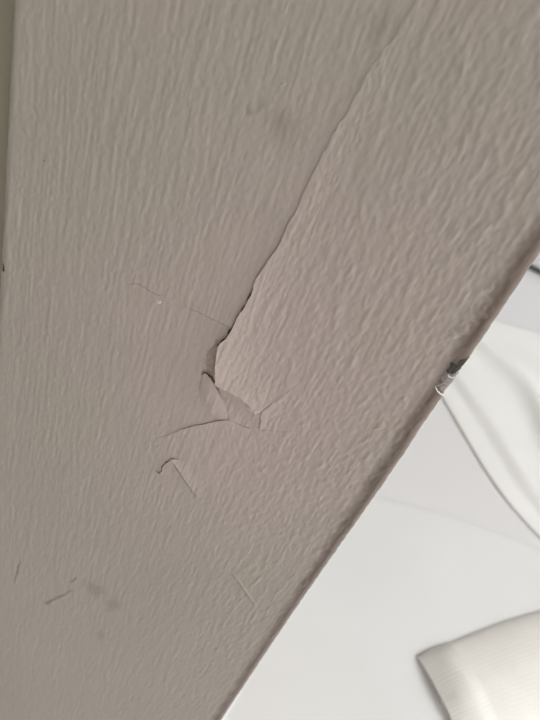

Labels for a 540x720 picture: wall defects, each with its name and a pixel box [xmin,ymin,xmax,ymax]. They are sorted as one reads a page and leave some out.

peeling [199,0,441,431]
spalling [435,356,470,396]